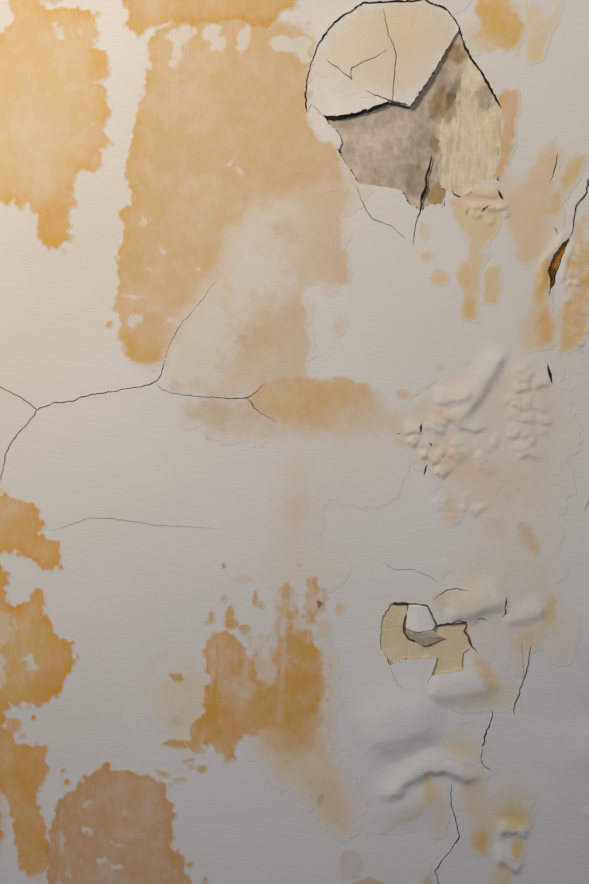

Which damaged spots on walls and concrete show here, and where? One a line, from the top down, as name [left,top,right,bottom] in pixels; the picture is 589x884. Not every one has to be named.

leakage [0,0,115,254]
crack [304,0,502,120]
spalling [325,31,501,210]
crack [0,281,276,480]
leakage [104,0,583,595]
crack [548,179,589,295]
leakage [0,488,211,884]
leakage [247,637,385,884]
peeling [380,602,479,675]
crack [434,785,460,884]
crack [480,644,531,770]